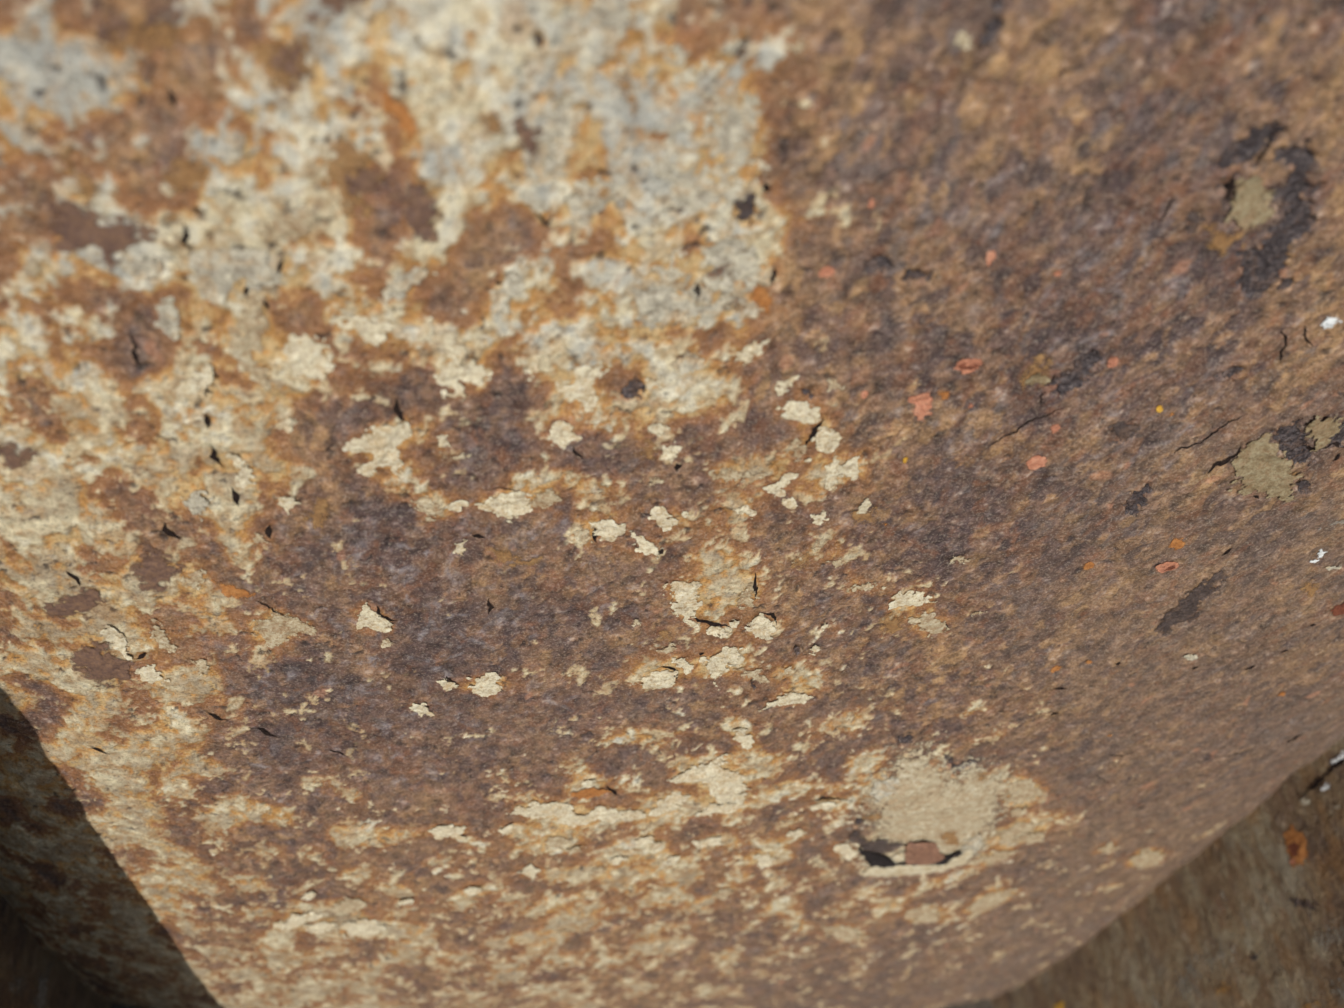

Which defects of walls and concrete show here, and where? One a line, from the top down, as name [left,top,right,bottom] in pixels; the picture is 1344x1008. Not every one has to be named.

corrosion [35,147,170,273]
corrosion [320,138,443,242]
spalling [1184,121,1323,299]
corrosion [0,442,40,470]
peeling [342,399,413,477]
peeling [708,375,861,525]
corrosion [43,572,106,621]
corrosion [70,638,135,688]
corrosion [130,540,185,592]
peeling [573,506,690,559]
peeling [638,573,778,691]
peeling [498,728,755,854]